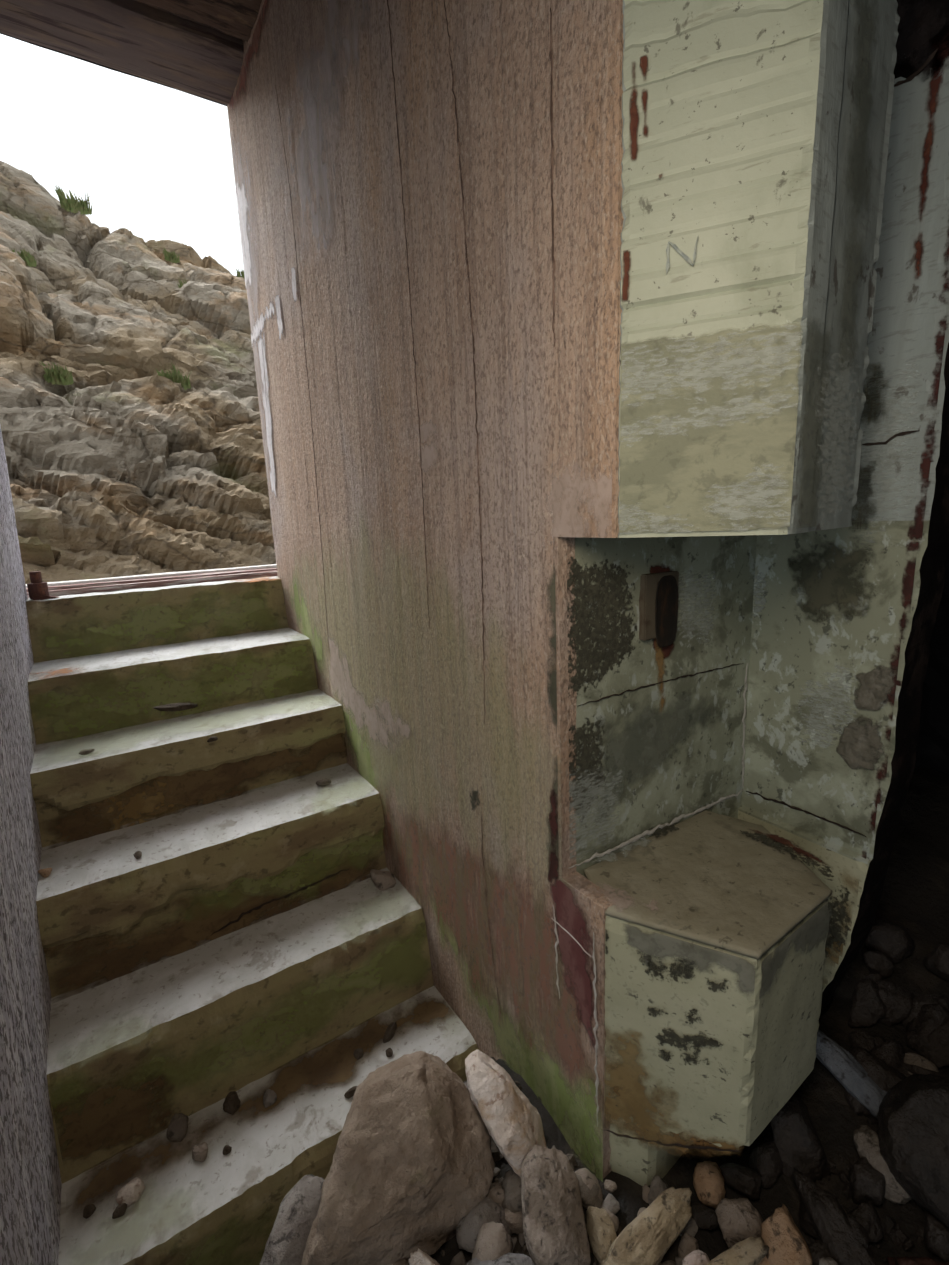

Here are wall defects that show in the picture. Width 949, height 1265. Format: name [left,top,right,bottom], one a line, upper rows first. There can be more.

rust [630,55,648,160]
rust [920,24,949,220]
rust [622,250,630,300]
rust [914,235,923,278]
rust [928,220,949,406]
peeling [549,324,829,538]
rust [883,421,936,740]
peeling [547,557,711,1127]
spalling [740,830,834,881]
rust [870,757,888,831]
peeling [637,951,728,993]
peeling [647,1007,723,1065]